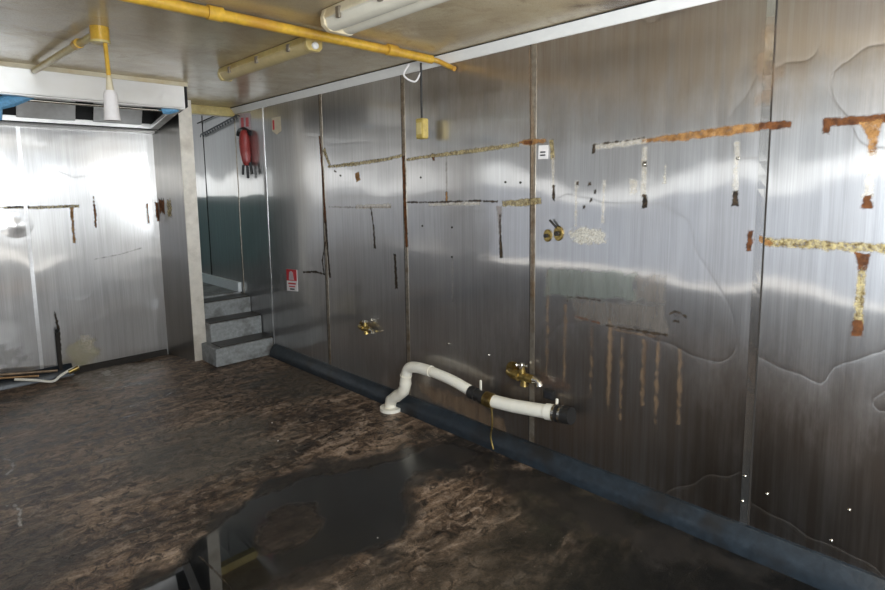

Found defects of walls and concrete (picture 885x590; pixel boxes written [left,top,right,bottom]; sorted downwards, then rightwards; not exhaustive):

rust [303,58,555,278]
rust [592,120,792,154]
rust [822,113,885,209]
rust [746,230,885,336]
water stain [118,429,785,590]